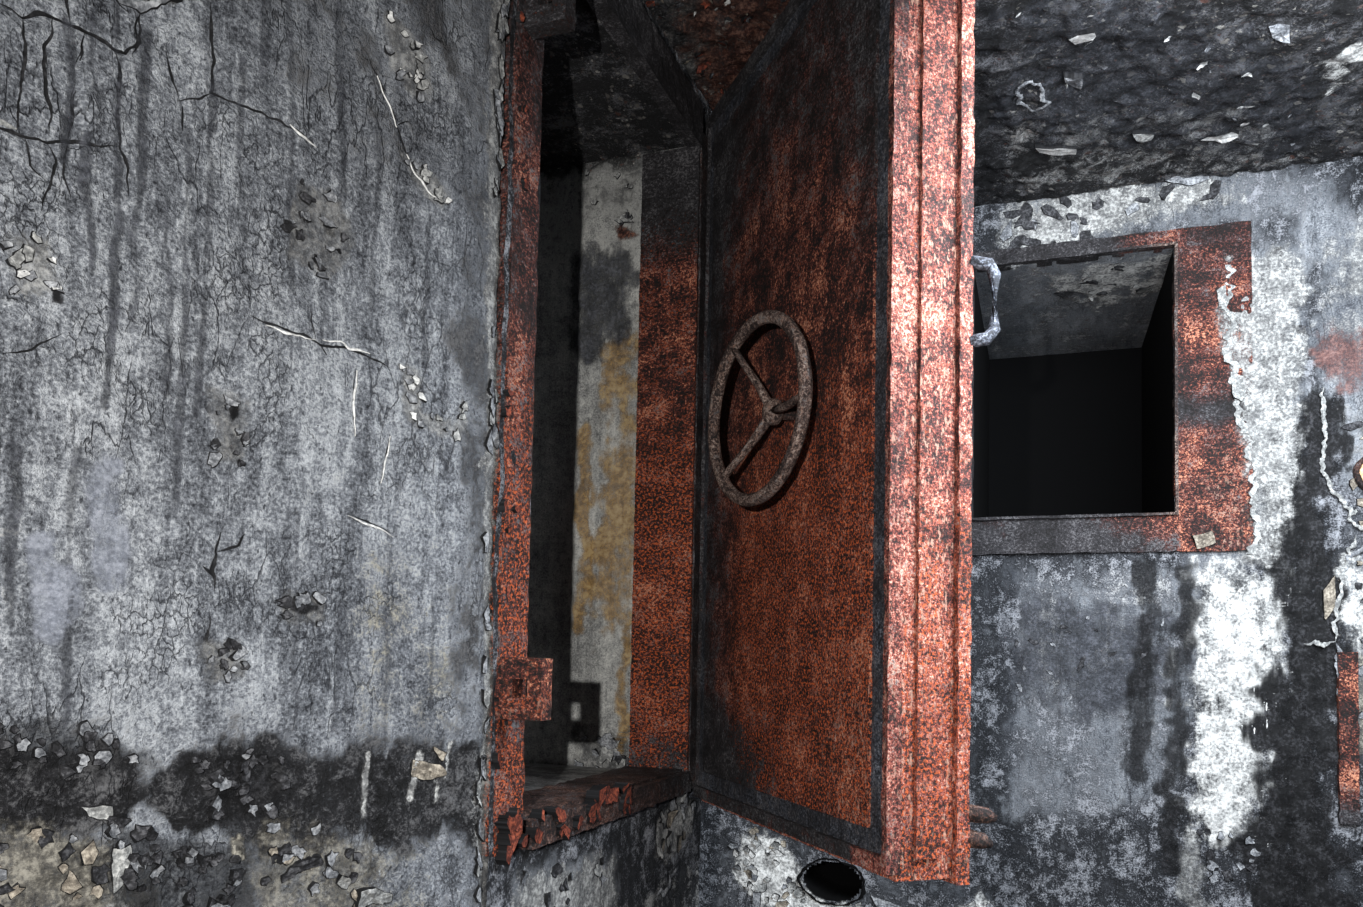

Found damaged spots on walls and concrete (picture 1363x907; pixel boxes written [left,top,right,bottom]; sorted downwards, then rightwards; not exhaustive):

rust [683,0,789,104]
crack [0,0,318,211]
damp [569,242,640,754]
damp [1337,558,1363,644]
peeling [207,637,251,684]
peeling [0,720,139,780]
peeling [0,803,245,907]
peeling [191,747,393,907]
damp [361,751,370,817]
damp [407,741,453,802]
rust [492,752,501,769]
rust [494,782,632,866]